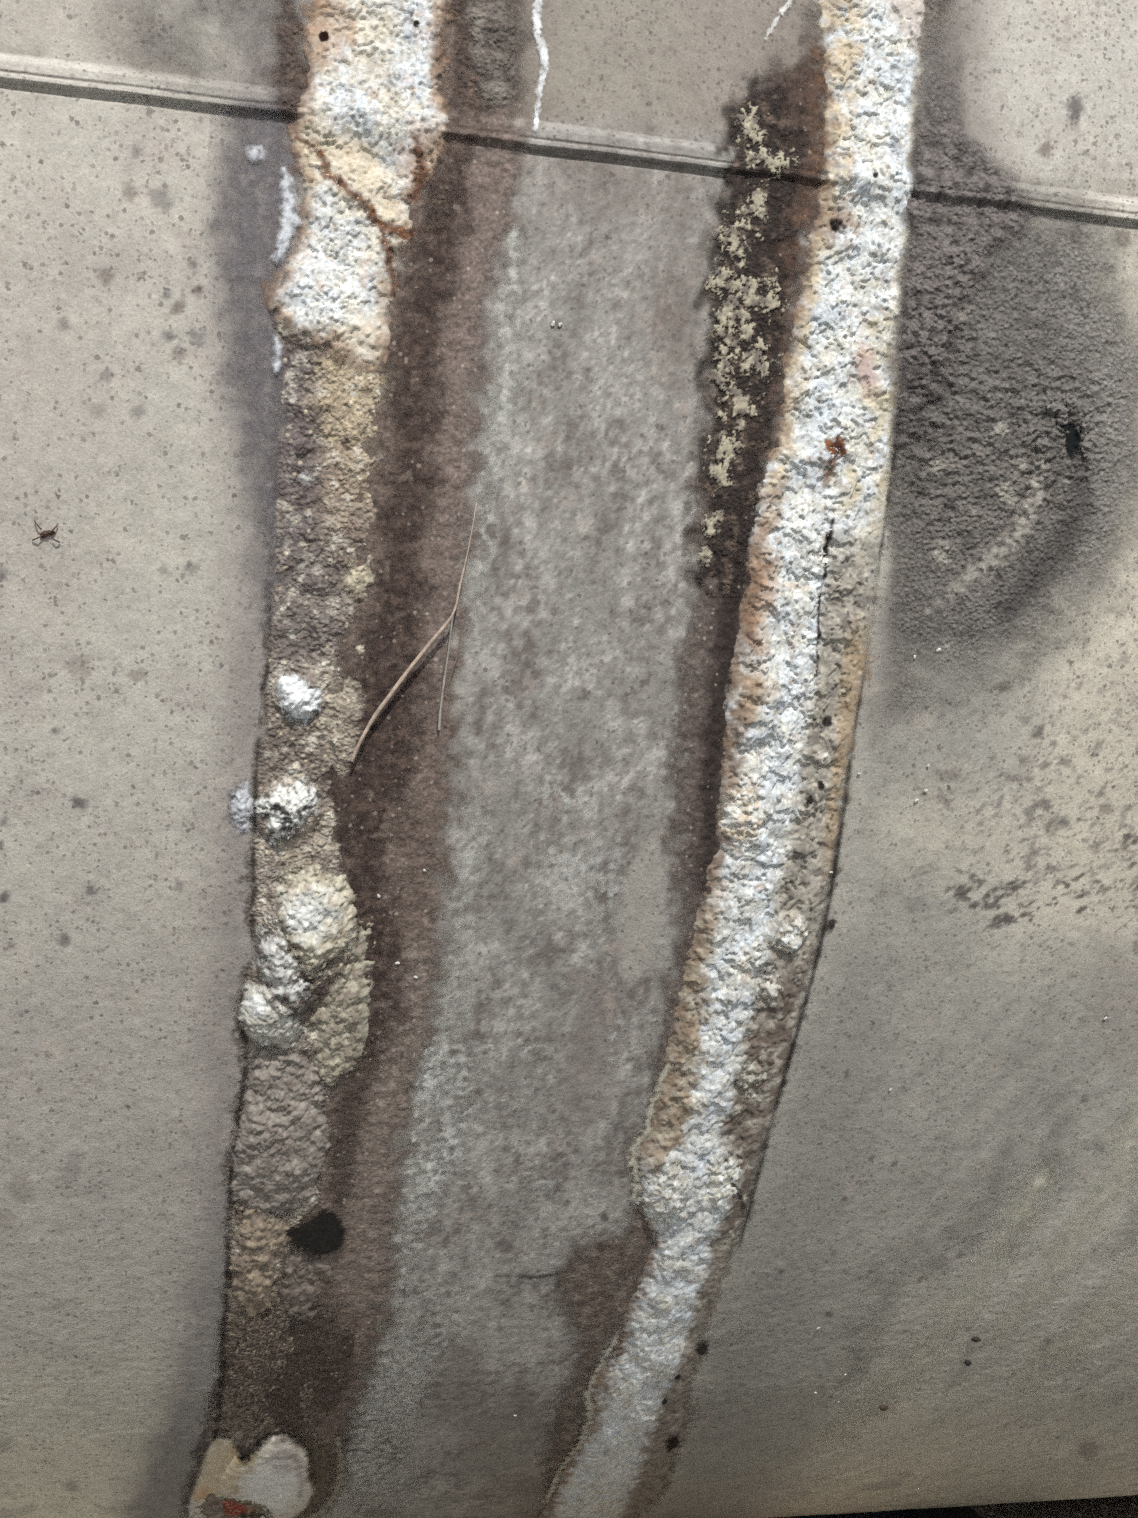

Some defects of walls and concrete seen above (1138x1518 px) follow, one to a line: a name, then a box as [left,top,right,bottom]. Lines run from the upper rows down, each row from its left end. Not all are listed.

leakage [472,231,519,575]
peeling [686,75,808,598]
spalling [182,318,390,1518]
leakage [534,0,925,1518]
leakage [343,1036,472,1510]